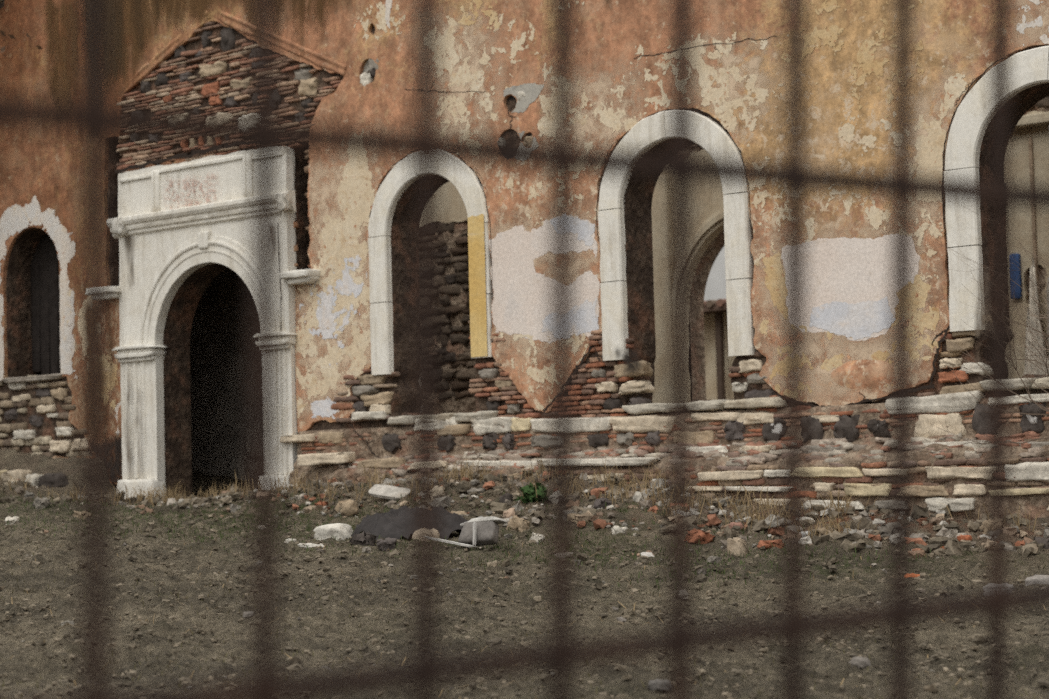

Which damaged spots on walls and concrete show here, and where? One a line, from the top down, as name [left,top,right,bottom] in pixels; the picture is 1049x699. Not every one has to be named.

spalling [116,21,253,116]
spalling [277,54,342,122]
peeling [438,0,552,142]
peeling [574,45,671,147]
crack [695,36,777,55]
peeling [693,32,786,133]
spalling [115,136,249,170]
peeling [295,155,401,423]
peeling [468,166,552,419]
peeling [573,194,598,258]
peeling [805,192,893,341]
spalling [573,271,655,418]